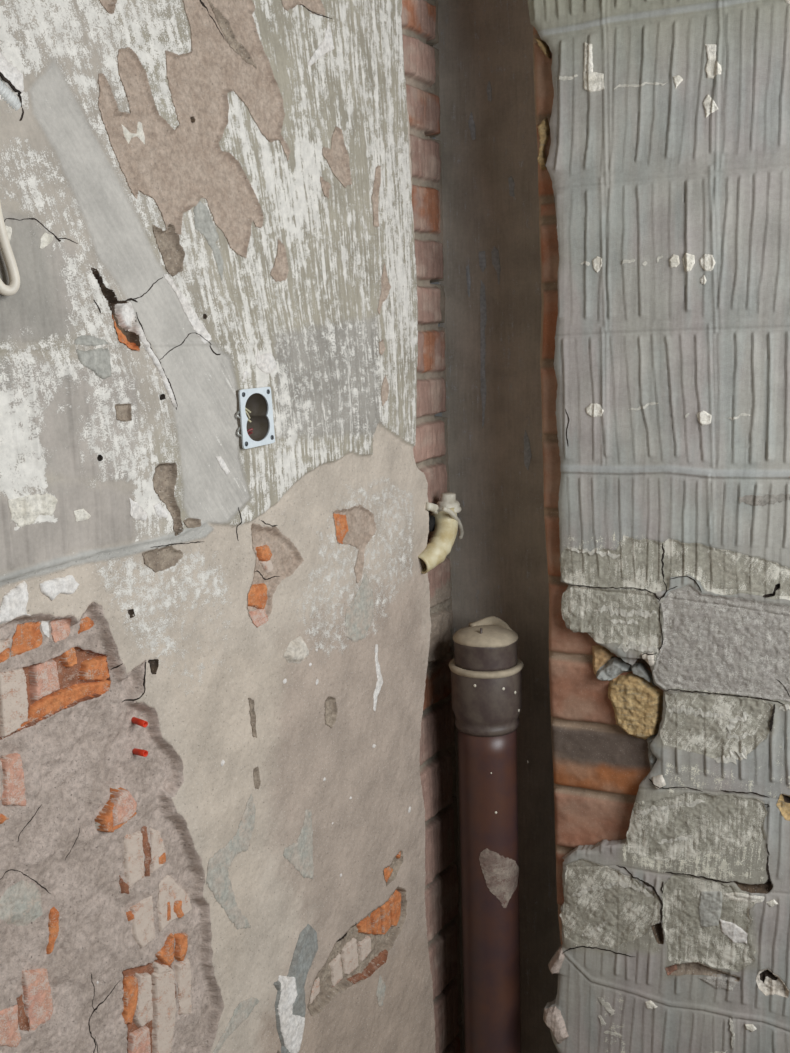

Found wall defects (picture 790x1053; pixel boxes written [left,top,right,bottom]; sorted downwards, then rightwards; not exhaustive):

crack [4,218,78,244]
spalling [97,0,291,344]
crack [125,277,220,410]
spalling [129,463,201,572]
spalling [247,523,304,628]
spalling [333,505,377,583]
peeling [560,535,790,761]
spalling [0,602,224,1053]
peeling [626,793,790,863]
spalling [308,850,407,1016]
peeling [560,859,789,998]
crack [88,974,120,1053]